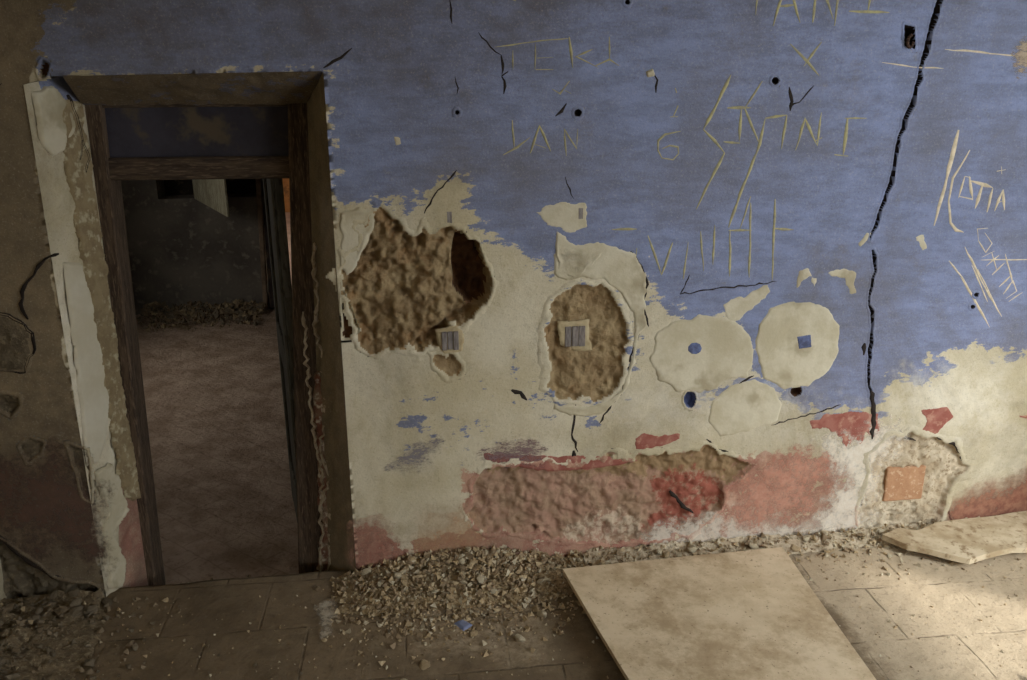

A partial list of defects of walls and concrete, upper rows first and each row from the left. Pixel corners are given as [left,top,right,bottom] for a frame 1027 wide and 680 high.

crack [478,32,508,93]
crack [788,86,814,111]
crack [861,0,946,440]
crack [0,253,59,374]
spalling [0,56,141,599]
spalling [301,200,500,571]
spalling [536,202,647,417]
spalling [461,433,767,549]
crack [774,404,841,425]
spalling [810,407,978,529]
crack [901,431,962,461]